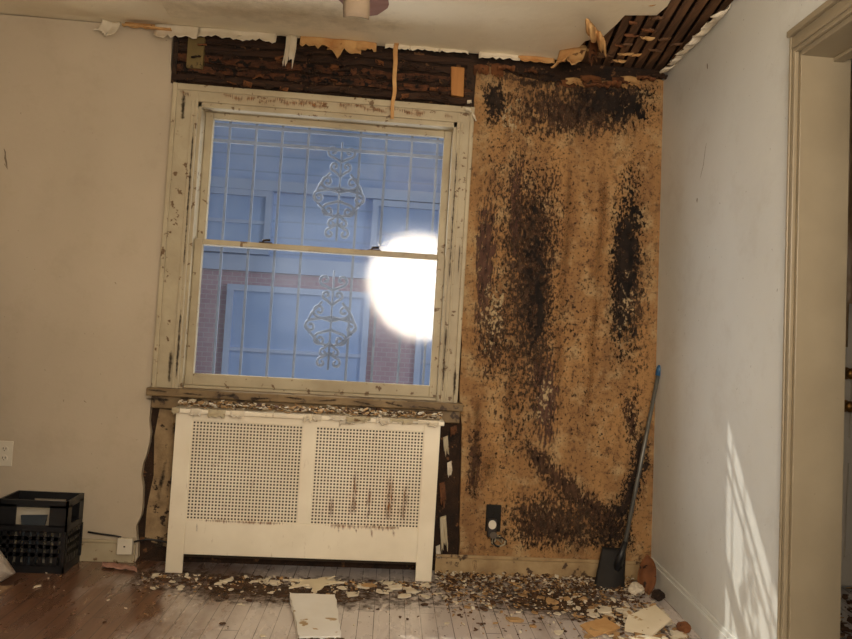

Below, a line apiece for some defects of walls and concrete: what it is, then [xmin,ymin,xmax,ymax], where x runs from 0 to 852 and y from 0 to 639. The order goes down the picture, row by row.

flaking render [94,0,731,561]
water stain [465,72,658,553]